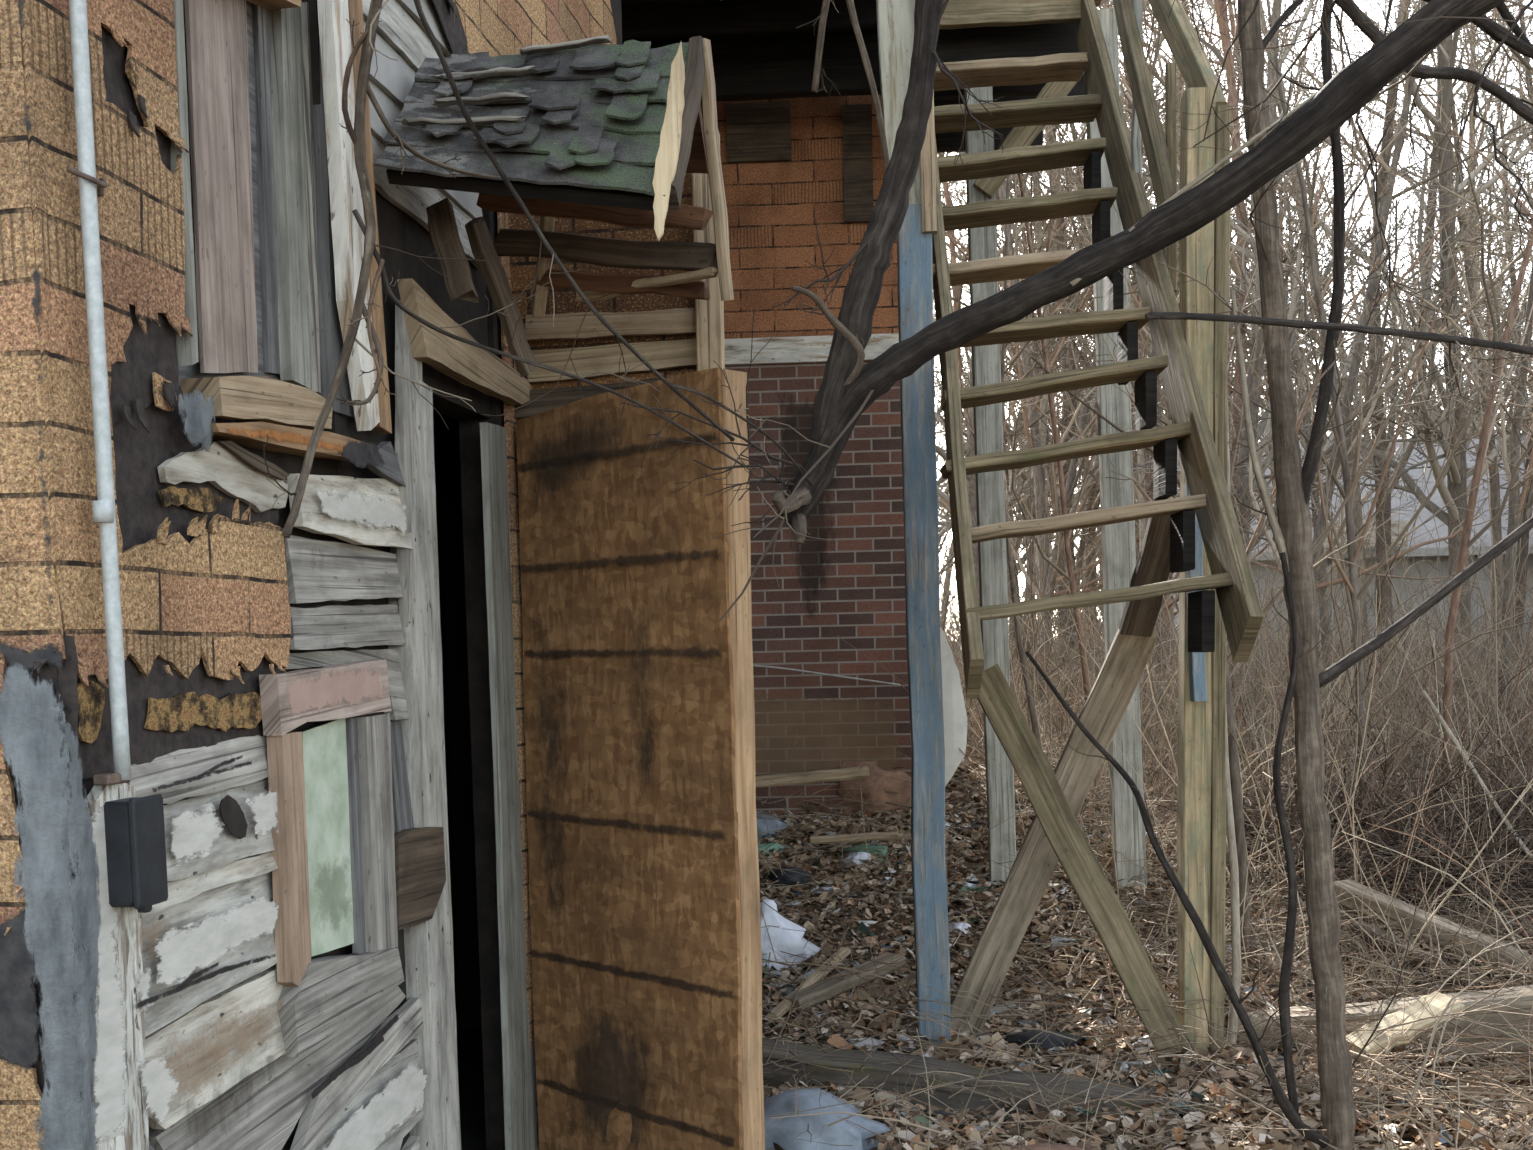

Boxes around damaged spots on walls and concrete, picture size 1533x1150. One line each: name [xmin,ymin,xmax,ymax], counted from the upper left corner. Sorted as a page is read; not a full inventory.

peeling [110,24,130,49]
peeling [127,95,148,137]
peeling [166,130,189,153]
peeling [121,372,178,433]
peeling [157,499,253,545]